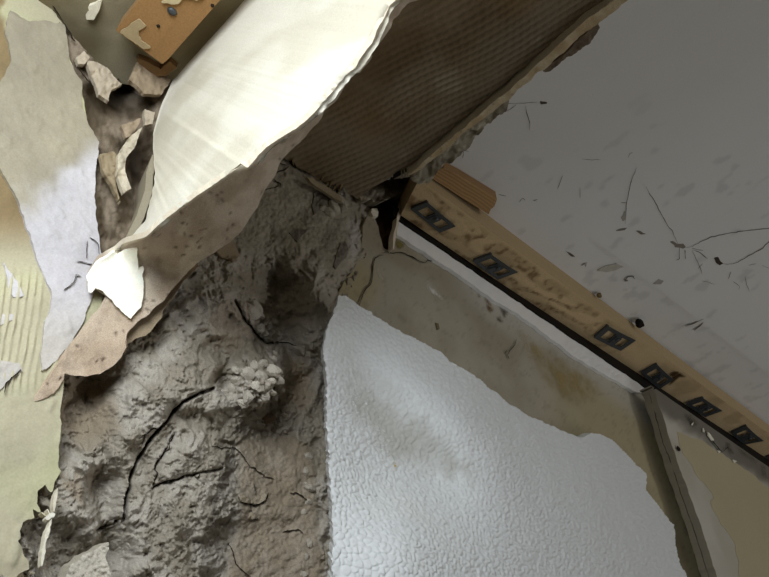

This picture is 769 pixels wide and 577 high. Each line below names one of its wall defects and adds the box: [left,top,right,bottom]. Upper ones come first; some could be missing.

spalling [346,0,417,73]
spalling [0,10,397,577]
crack [359,252,430,304]
crack [622,154,769,289]
crack [98,388,220,530]
crack [215,446,274,520]
peeling [677,432,769,577]